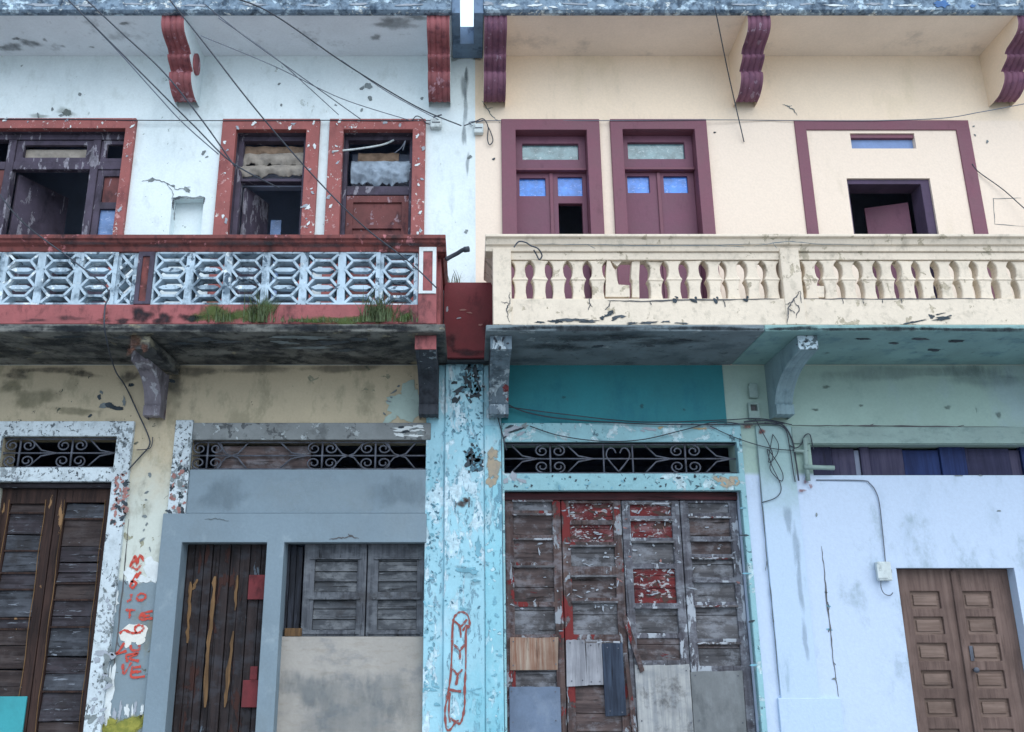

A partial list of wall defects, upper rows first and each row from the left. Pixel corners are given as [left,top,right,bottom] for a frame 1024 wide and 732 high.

water stain [42,308,241,358]
crack [588,291,991,322]
peeling [383,380,425,437]
peeling [503,423,529,439]
peeling [165,422,191,514]
peeling [503,471,533,489]
peeling [611,475,738,489]
peeling [422,364,498,719]
peeling [84,515,159,726]
crack [821,546,839,696]